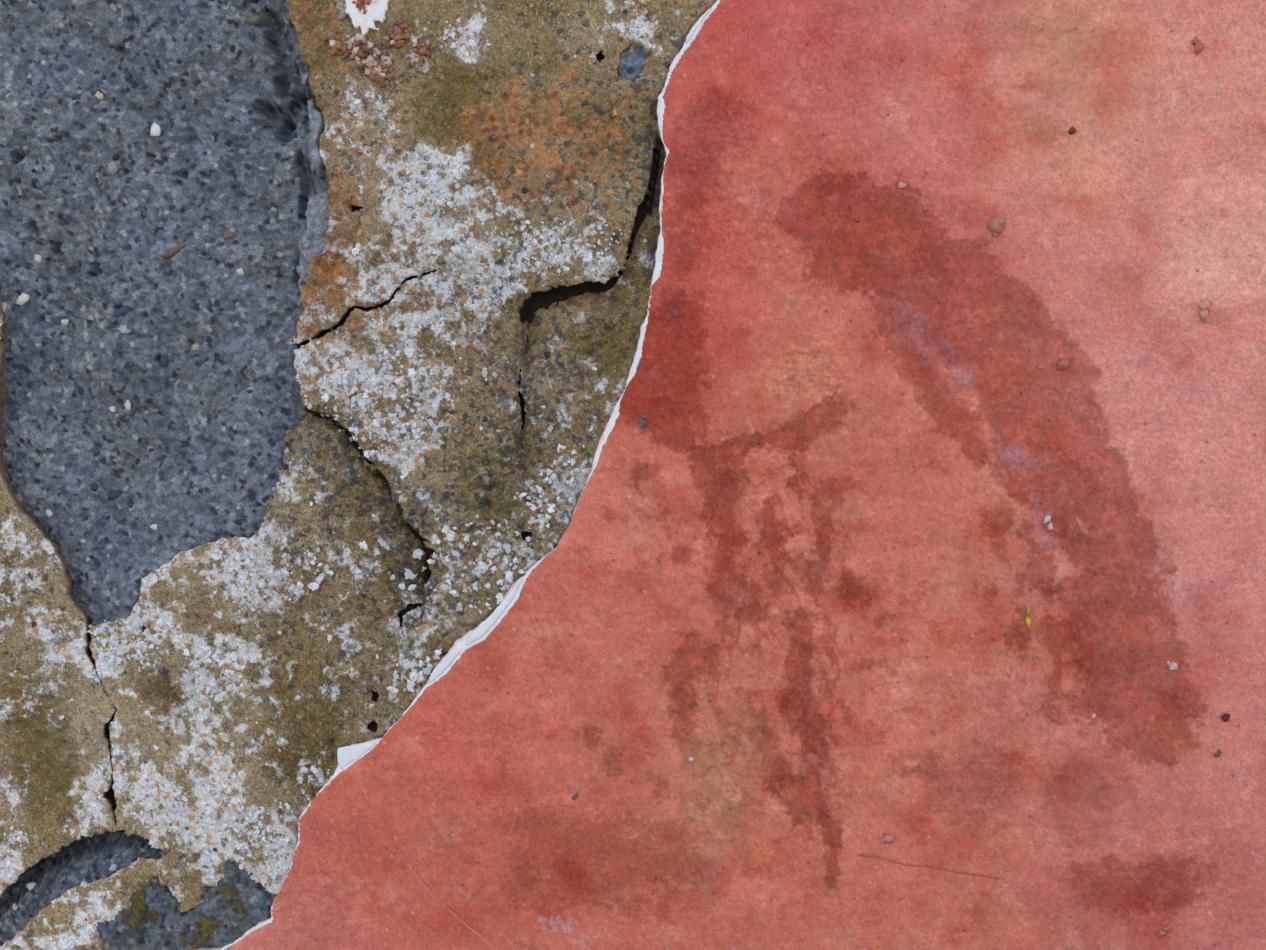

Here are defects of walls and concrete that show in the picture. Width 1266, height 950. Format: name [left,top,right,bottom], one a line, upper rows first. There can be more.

spalling [0,0,330,624]
crack [297,270,437,348]
crack [518,150,660,430]
peeling [571,0,720,520]
spalling [0,831,167,949]
crack [106,781,126,832]
spalling [94,858,276,950]
crack [397,524,434,626]
peeling [285,548,556,879]
damp [620,288,886,887]
damp [778,173,1207,766]
damp [1071,856,1215,917]